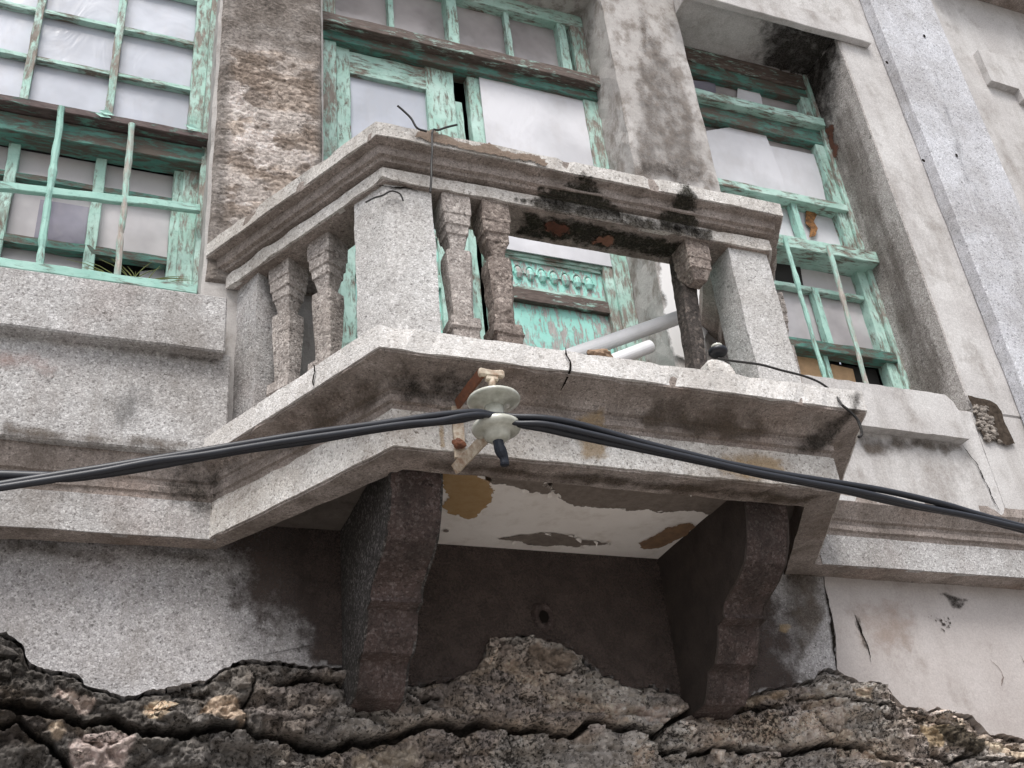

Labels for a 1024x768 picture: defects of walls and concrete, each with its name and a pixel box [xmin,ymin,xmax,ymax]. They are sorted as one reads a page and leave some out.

water stain [757,23,835,122]
water stain [514,23,712,259]
crack [561,347,572,390]
water stain [800,393,860,452]
spalling [968,395,1015,445]
crack [963,446,999,509]
flaking render [500,532,612,550]
crack [824,588,871,663]
flaking render [0,635,1024,768]